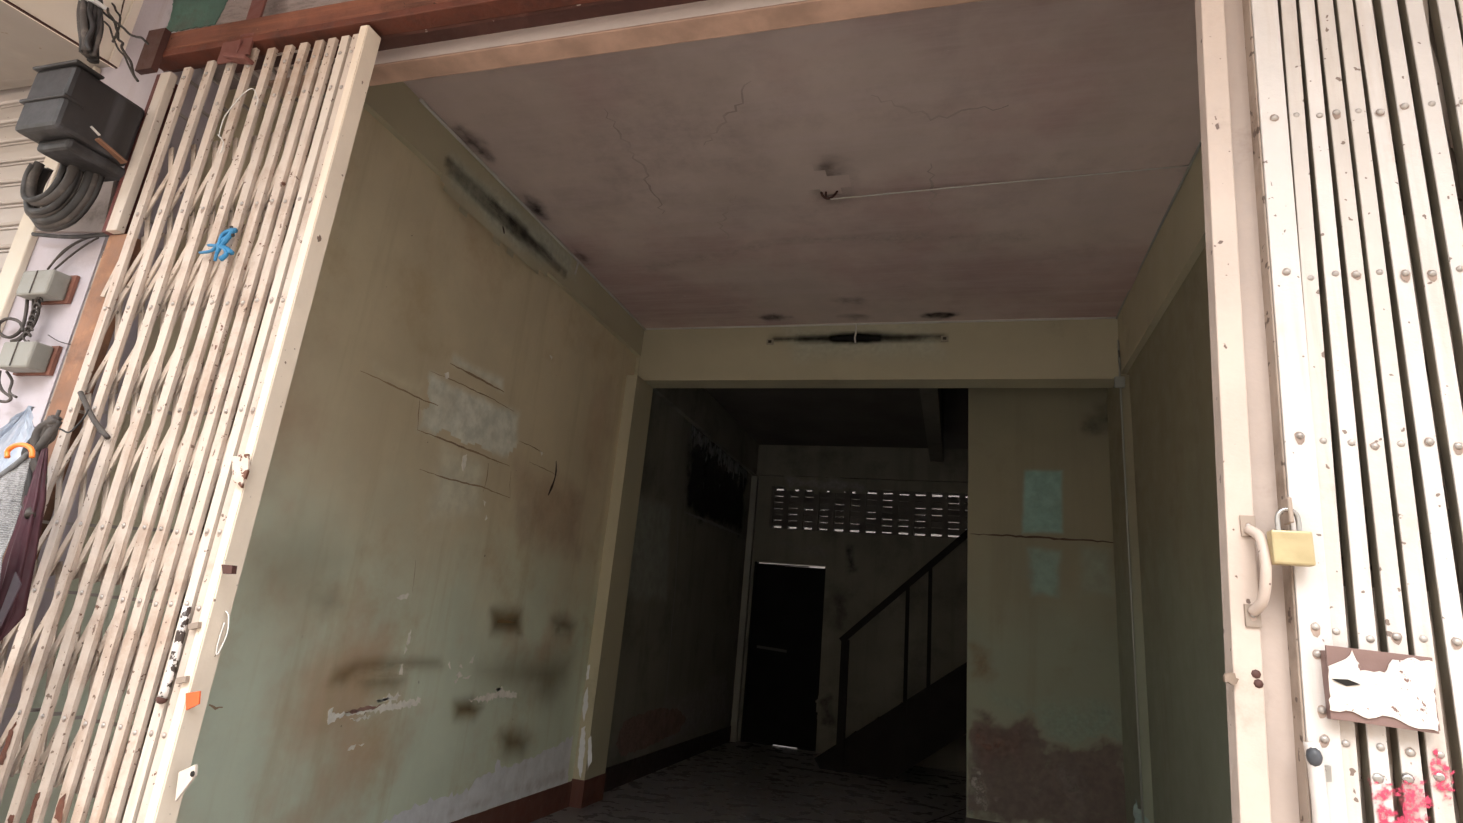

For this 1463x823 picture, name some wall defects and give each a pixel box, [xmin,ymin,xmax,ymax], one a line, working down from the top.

peeling [166,0,228,32]
peeling [327,693,421,725]
peeling [382,665,592,823]